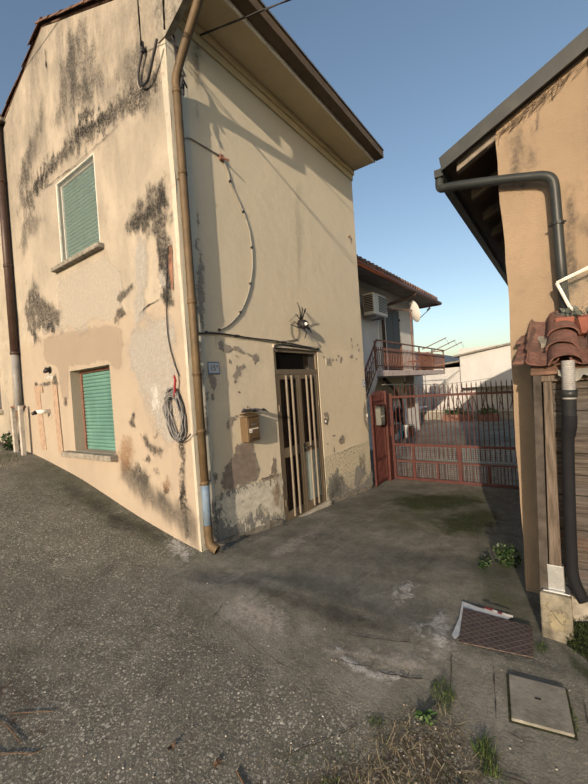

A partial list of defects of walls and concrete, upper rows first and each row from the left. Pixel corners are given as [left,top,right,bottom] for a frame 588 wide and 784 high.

leakage [20,28,157,246]
leakage [125,179,173,305]
leakage [25,285,59,343]
flaking render [218,340,258,393]
leakage [123,437,195,562]
flaking render [204,442,287,550]
flaking render [326,464,373,500]
crack [338,650,588,722]